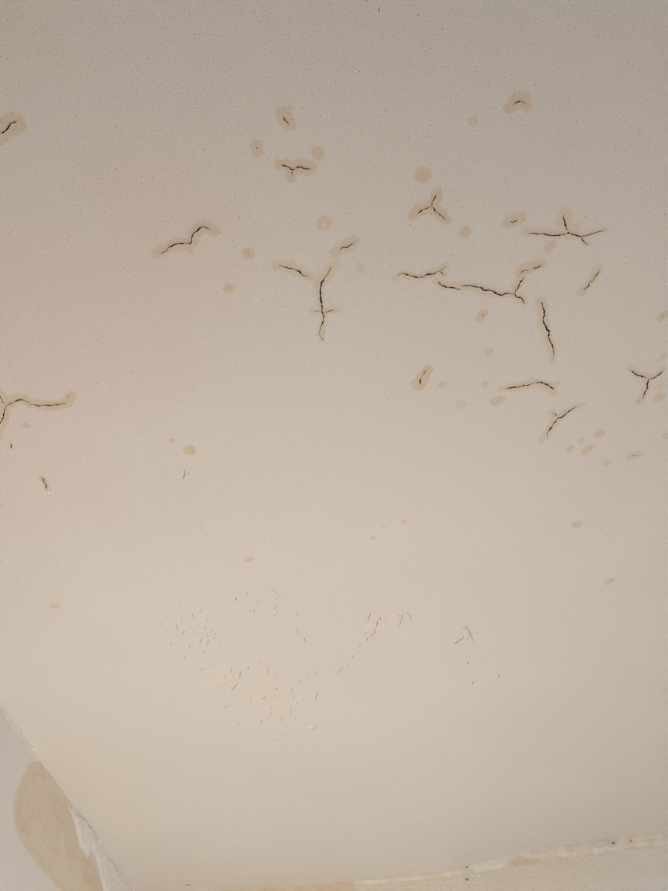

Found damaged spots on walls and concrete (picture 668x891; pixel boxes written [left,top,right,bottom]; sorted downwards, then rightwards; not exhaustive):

water stain [12,760,104,891]
water stain [220,846,668,891]